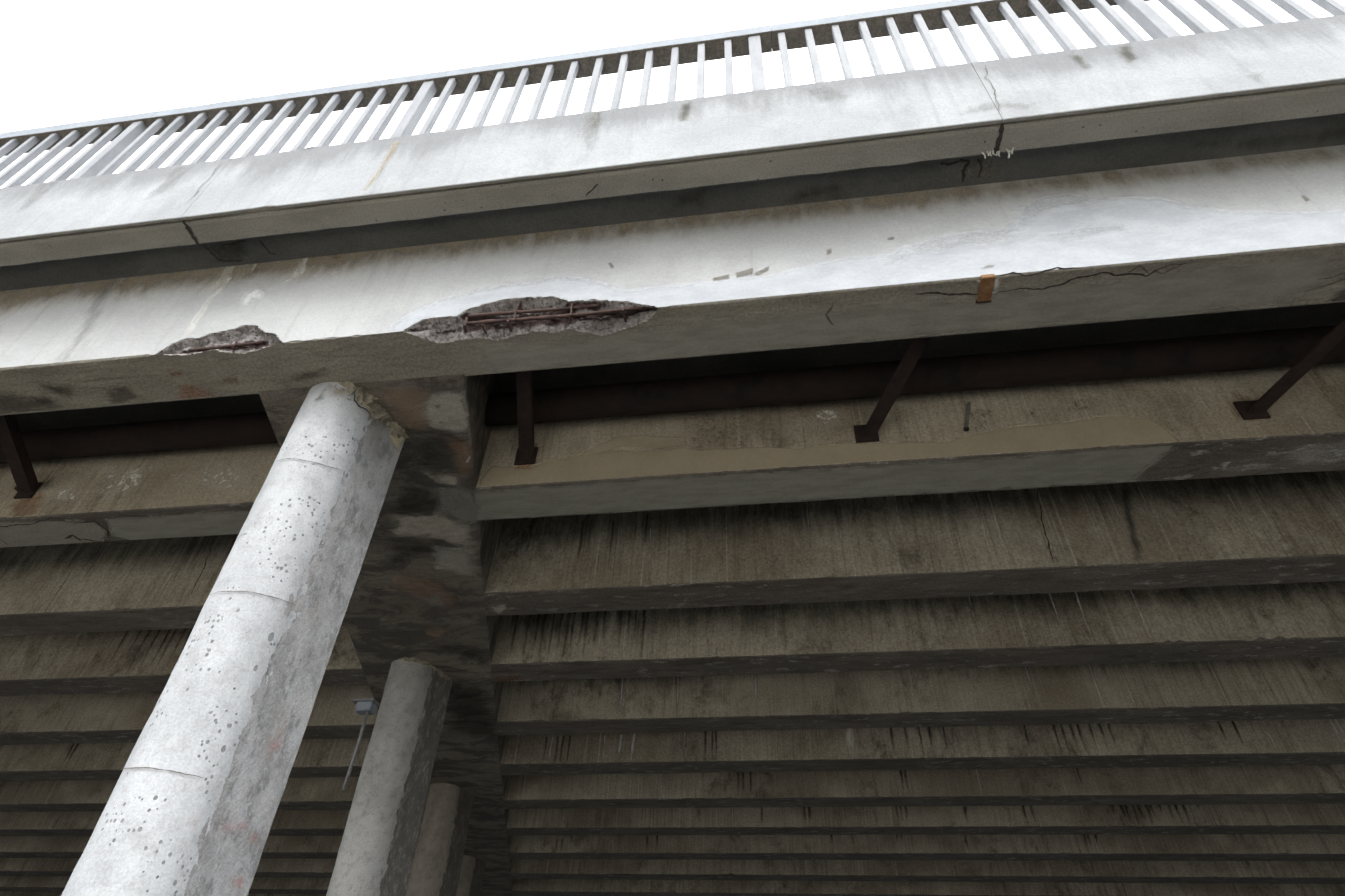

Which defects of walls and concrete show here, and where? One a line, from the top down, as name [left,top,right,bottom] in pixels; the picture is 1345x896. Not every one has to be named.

crack [984,64,1004,154]
crack [917,261,1188,296]
spalling [155,324,283,356]
spalling [403,296,659,344]
damp [493,470,1345,560]
damp [511,605,796,646]